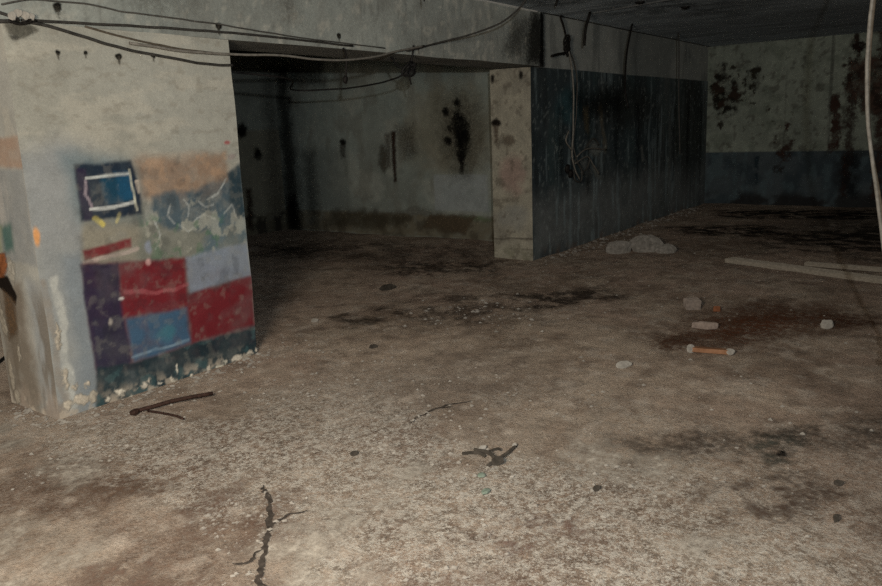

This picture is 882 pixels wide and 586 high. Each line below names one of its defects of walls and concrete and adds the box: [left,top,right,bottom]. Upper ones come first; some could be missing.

crack [233,485,307,586]